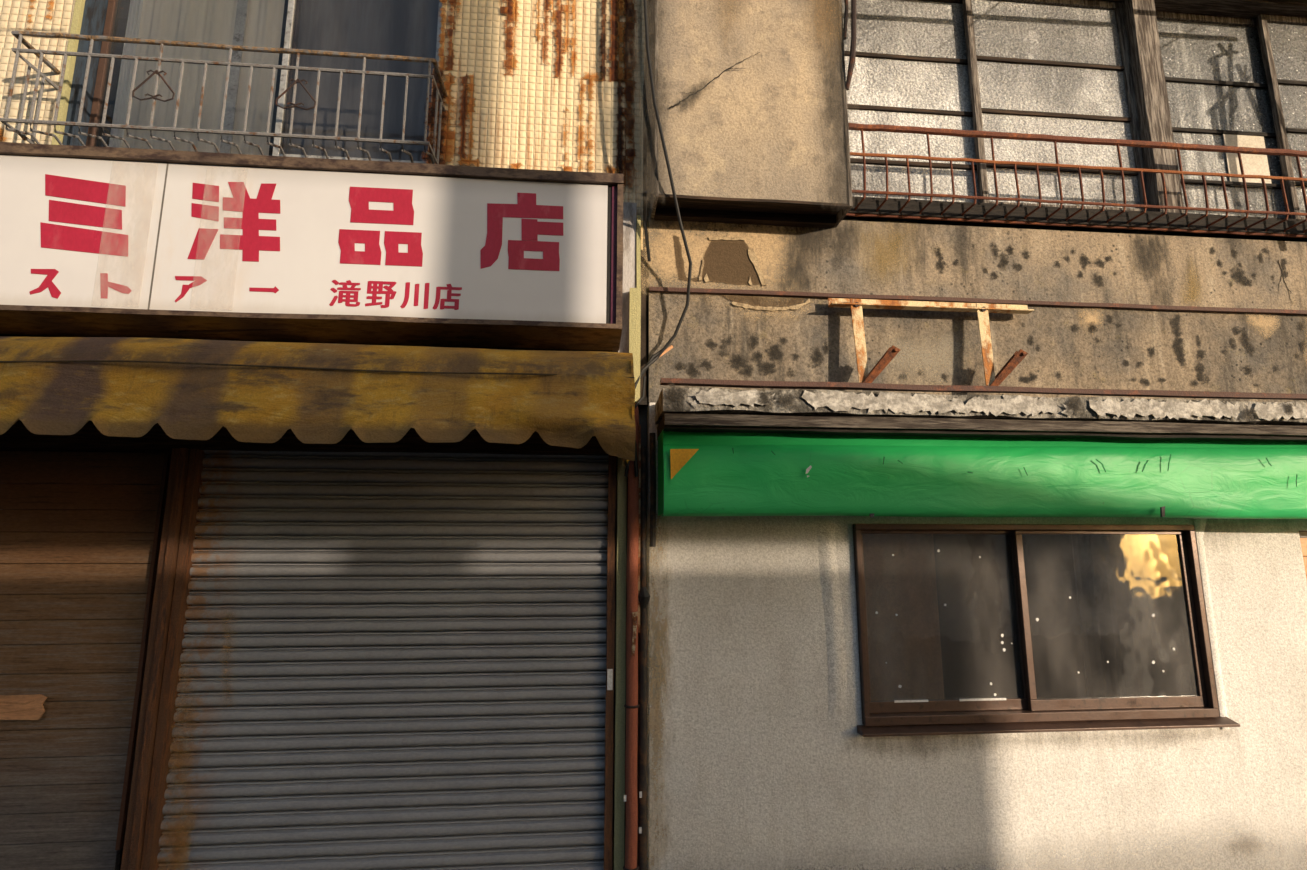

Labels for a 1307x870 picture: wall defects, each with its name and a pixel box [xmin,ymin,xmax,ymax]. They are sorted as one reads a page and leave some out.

corrosion [500,0,519,76]
corrosion [422,0,480,167]
corrosion [535,0,637,188]
crack [669,52,760,109]
flaking render [673,235,810,318]
mould [935,248,958,273]
mould [983,242,1030,279]
mould [1055,250,1116,287]
mould [1210,247,1288,287]
water stain [1171,315,1210,386]
peeling [802,390,1073,416]
peeling [1089,398,1307,421]